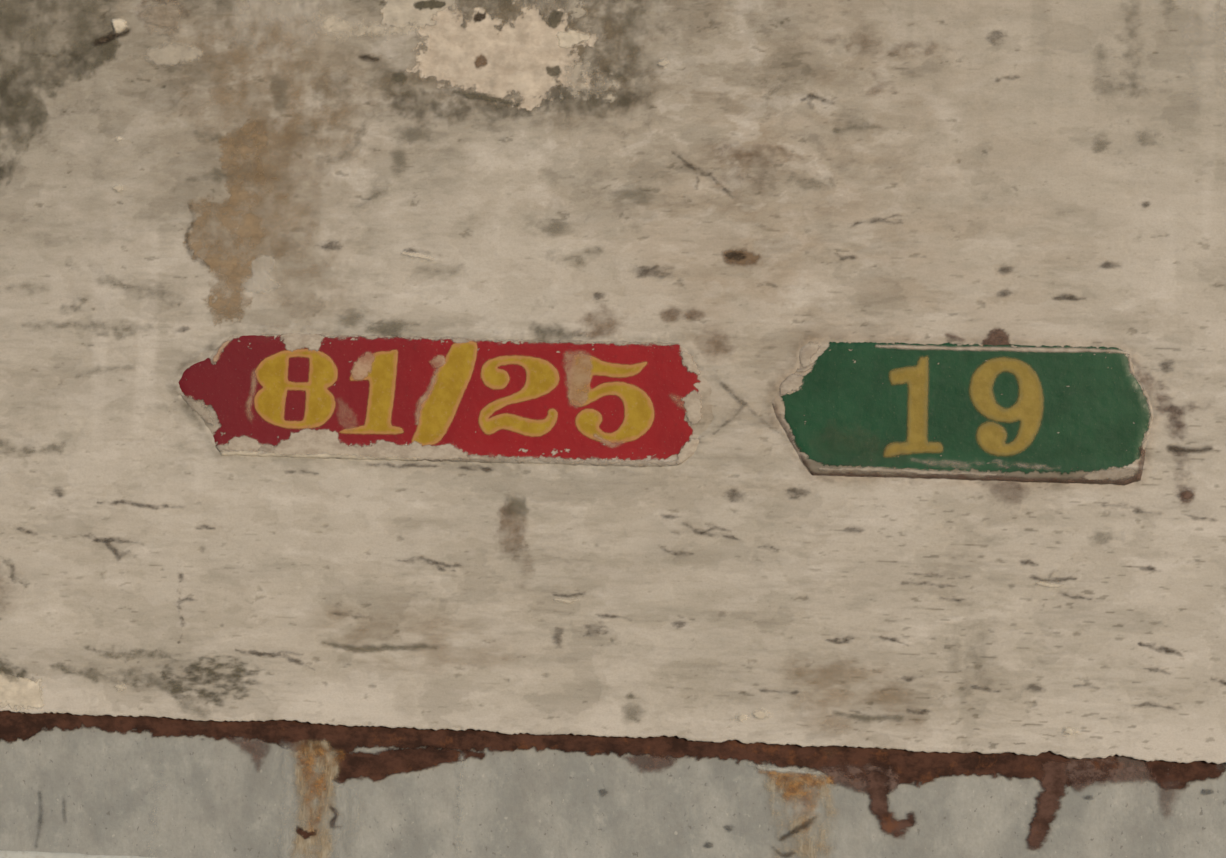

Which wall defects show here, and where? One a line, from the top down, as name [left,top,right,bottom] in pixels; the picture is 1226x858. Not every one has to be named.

damp [0,58,44,146]
peeling [324,0,617,111]
damp [480,0,524,31]
damp [539,0,636,106]
peeling [0,661,43,711]
corrosion [0,710,1226,858]